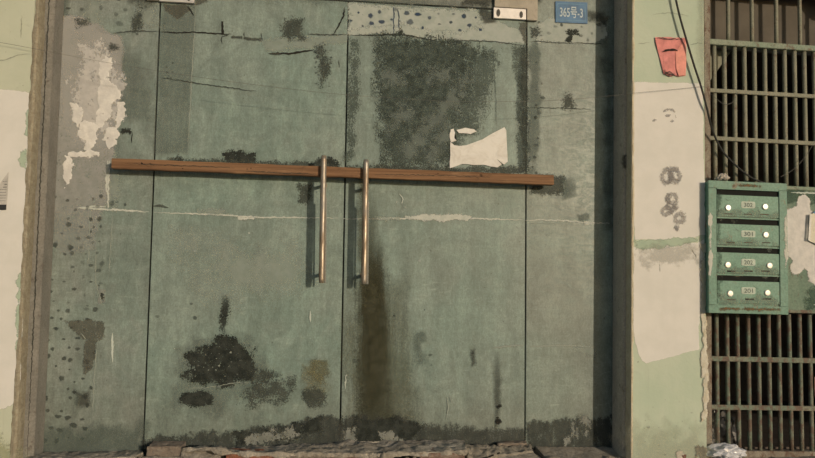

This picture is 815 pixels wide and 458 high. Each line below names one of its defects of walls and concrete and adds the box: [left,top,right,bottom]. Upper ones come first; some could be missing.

crack [117,7,601,55]
peeling [480,9,495,23]
peeling [62,56,127,188]
spalling [625,0,713,458]
peeling [784,194,815,285]
water stain [218,300,231,336]
water stain [353,224,412,423]
water stain [233,416,324,446]